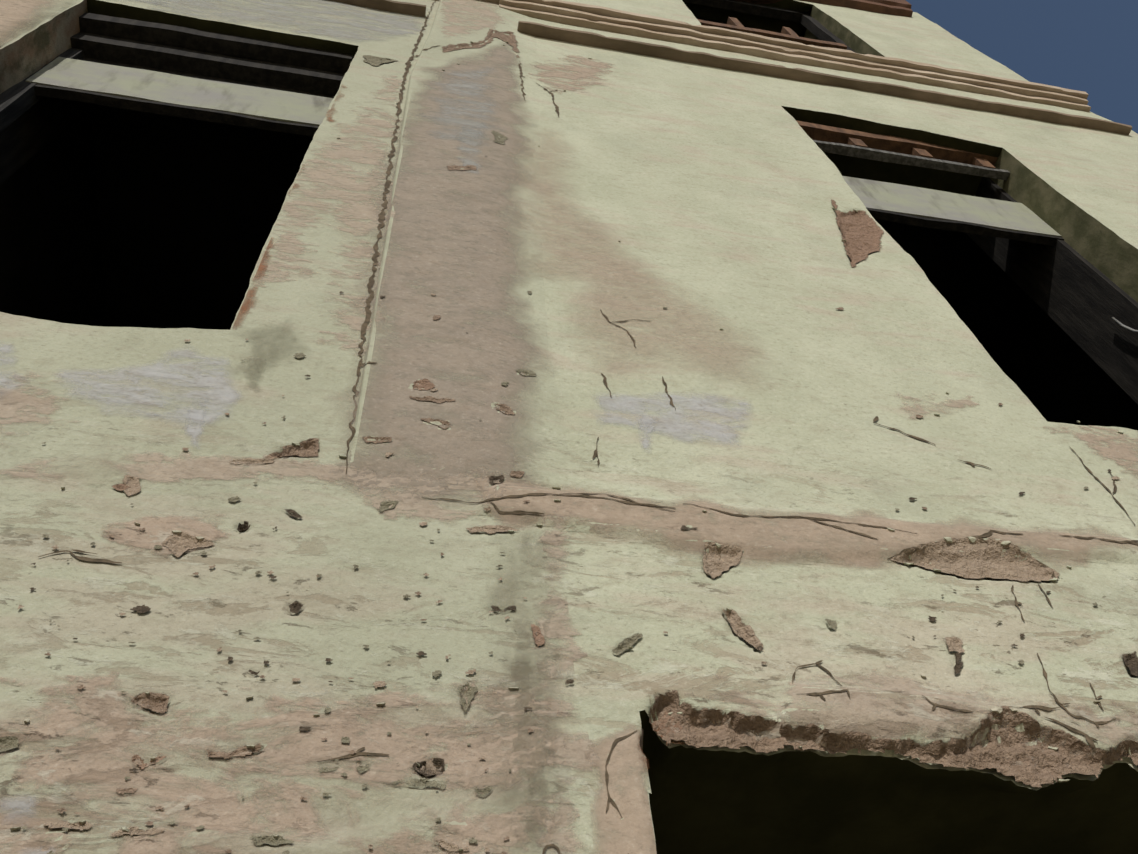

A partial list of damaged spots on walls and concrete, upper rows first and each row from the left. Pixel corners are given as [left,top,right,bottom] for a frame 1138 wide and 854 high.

crack [346,0,440,474]
peeling [90,0,1138,596]
crack [601,310,648,348]
peeling [0,375,64,435]
crack [1061,446,1138,545]
flaking render [119,605,151,615]
flaking render [286,592,303,613]
crack [422,493,1057,621]
crack [605,730,637,817]
flaking render [589,666,1138,854]